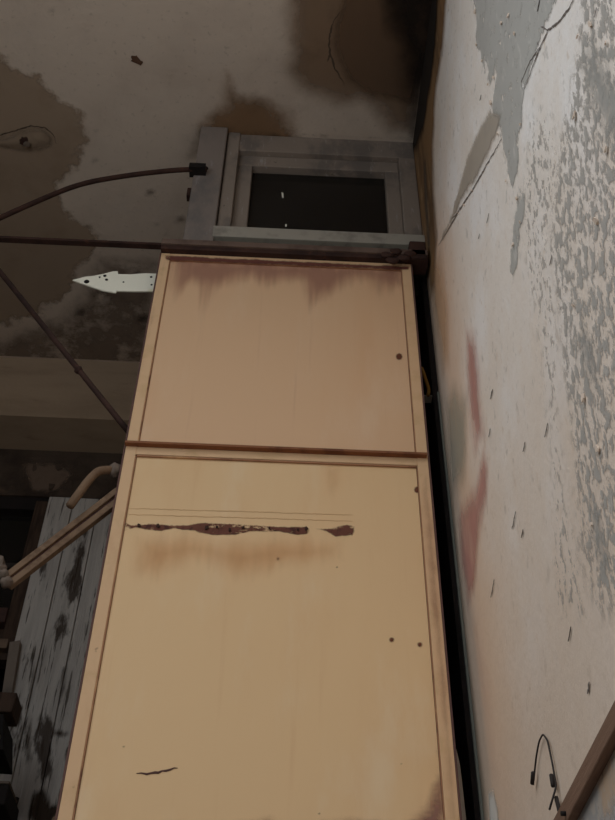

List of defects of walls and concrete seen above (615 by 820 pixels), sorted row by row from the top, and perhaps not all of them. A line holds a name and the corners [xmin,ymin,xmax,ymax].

crack [521,0,573,87]
water stain [0,59,97,326]
water stain [206,97,291,137]
water stain [294,0,445,336]
crack [440,140,501,243]
water stain [0,289,149,362]
peeling [473,0,615,606]
flaking render [578,750,615,820]